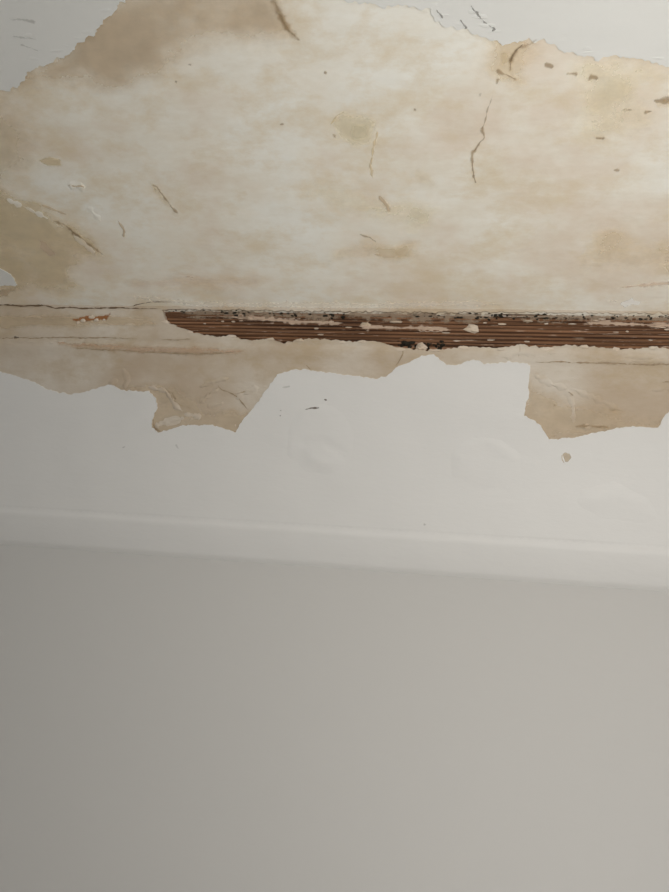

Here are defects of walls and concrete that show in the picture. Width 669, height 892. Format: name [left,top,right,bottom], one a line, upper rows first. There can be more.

leakage [51,0,289,84]
leakage [0,196,99,296]
peeling [0,0,669,440]
mould [397,340,445,350]
leakage [412,313,515,321]